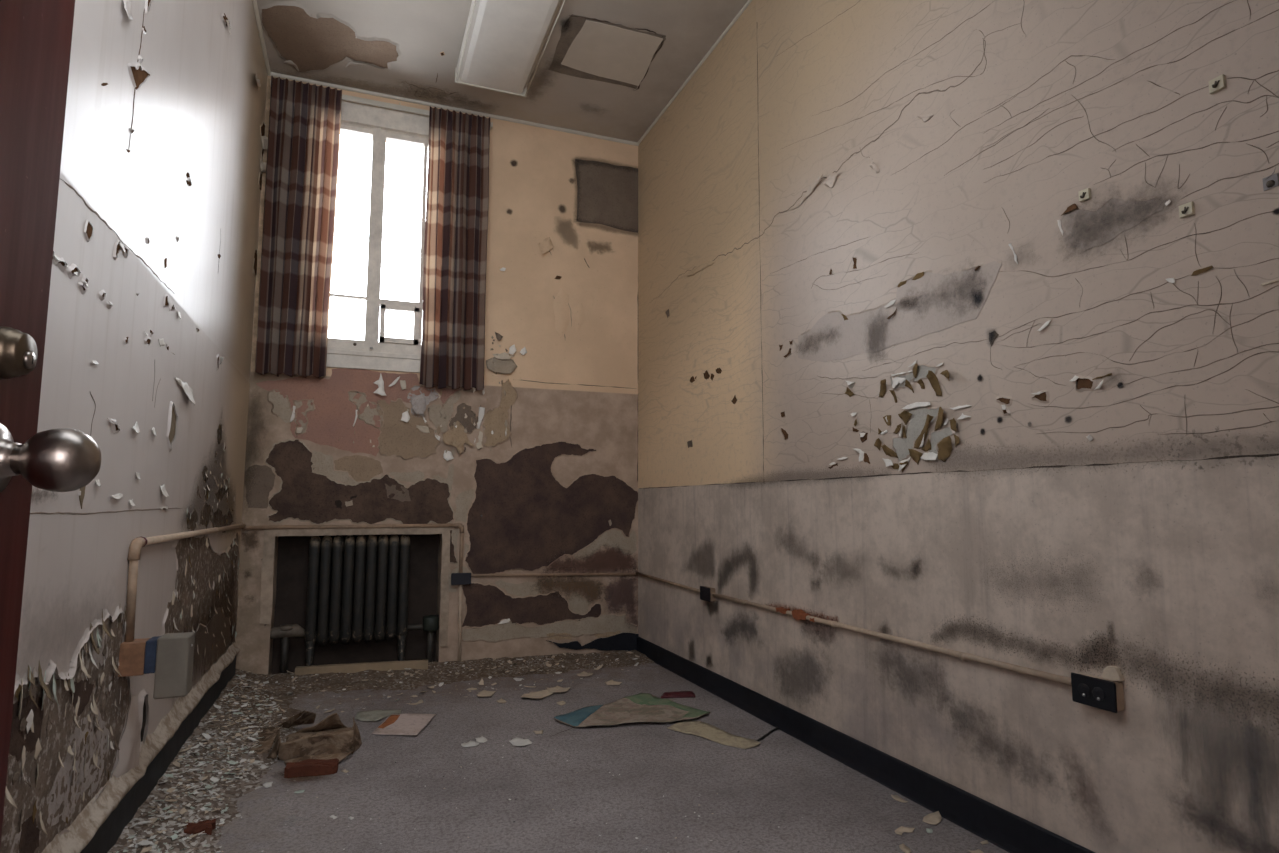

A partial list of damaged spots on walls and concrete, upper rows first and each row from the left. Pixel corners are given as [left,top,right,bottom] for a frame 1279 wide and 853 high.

peeling [127,55,150,91]
peeling [258,0,402,74]
peeling [52,251,113,309]
spalling [84,220,93,242]
peeling [113,239,129,260]
crack [510,0,1279,489]
peeling [107,401,178,452]
peeling [828,360,972,472]
spalling [162,332,639,705]
leakage [707,546,756,614]
leakage [934,615,1279,735]
spalling [0,605,149,853]